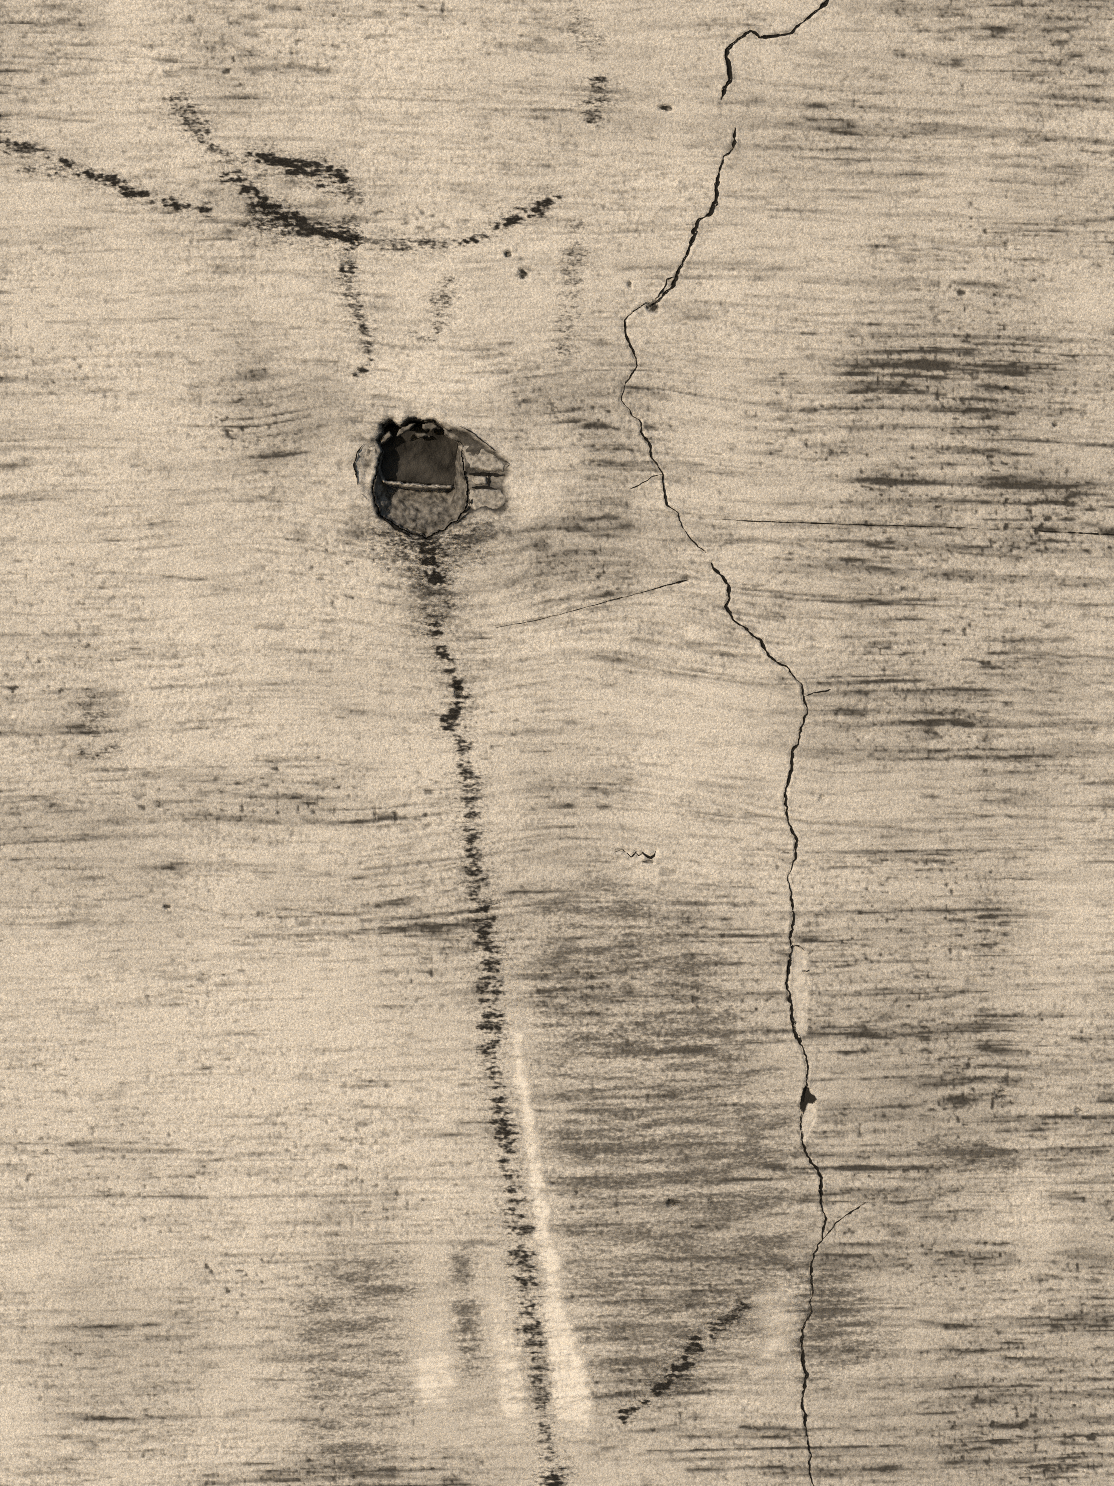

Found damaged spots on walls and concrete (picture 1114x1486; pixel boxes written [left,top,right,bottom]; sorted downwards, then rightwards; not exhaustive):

crack [621,0,866,1486]